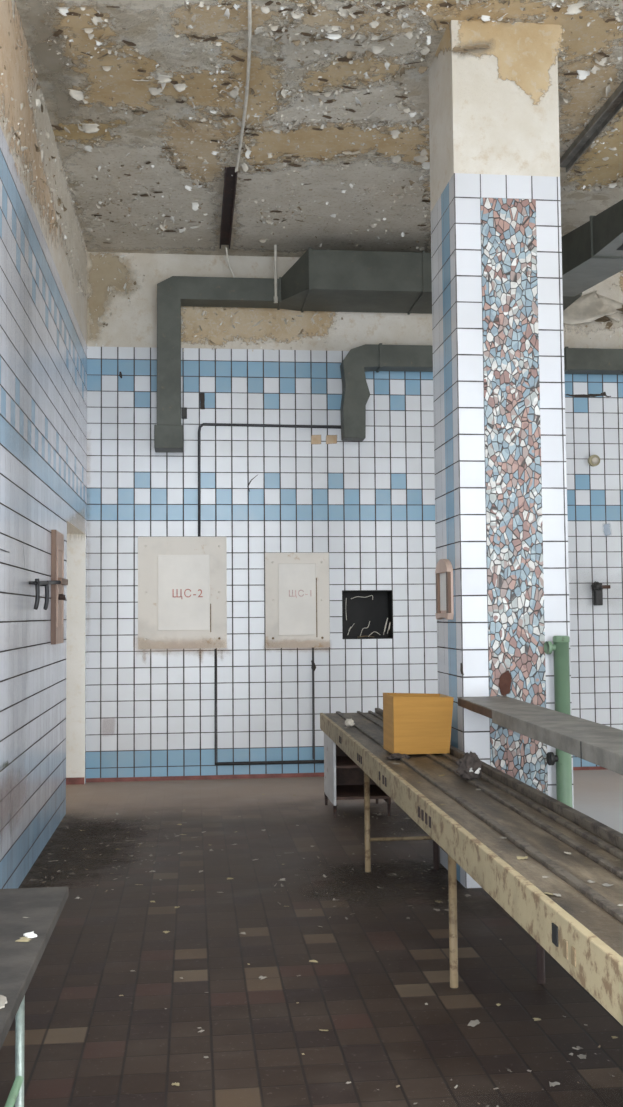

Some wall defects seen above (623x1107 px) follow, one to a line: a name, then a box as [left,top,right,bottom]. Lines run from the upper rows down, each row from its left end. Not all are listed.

peeling [0,0,623,353]